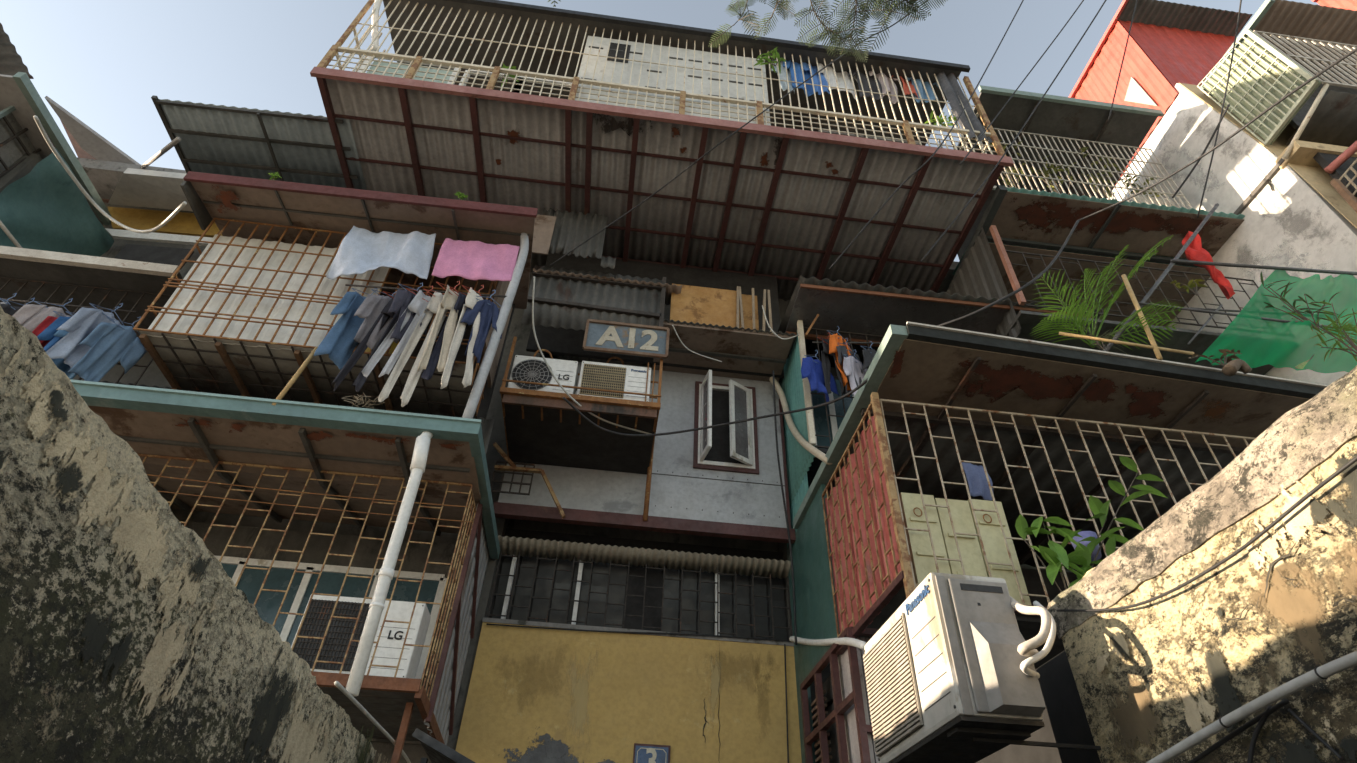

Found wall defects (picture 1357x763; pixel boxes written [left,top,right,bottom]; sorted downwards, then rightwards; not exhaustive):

rust [1006,194,1238,240]
rust [958,358,1168,419]
water stain [51,456,83,498]
water stain [1248,447,1357,667]
water stain [69,599,134,683]
flaking render [499,727,615,763]
crack [703,648,721,763]
water stain [1108,674,1163,758]
water stain [1203,607,1242,733]